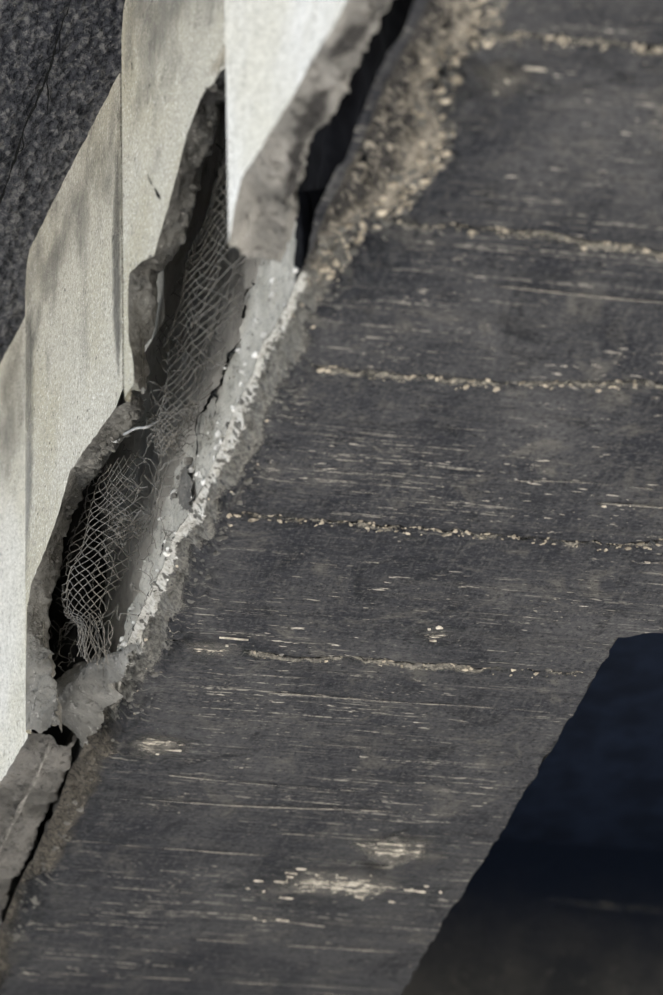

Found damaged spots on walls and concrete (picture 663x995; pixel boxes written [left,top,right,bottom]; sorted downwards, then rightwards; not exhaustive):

peeling [470,60,546,96]
spalling [0,0,510,987]
crack [0,743,52,851]